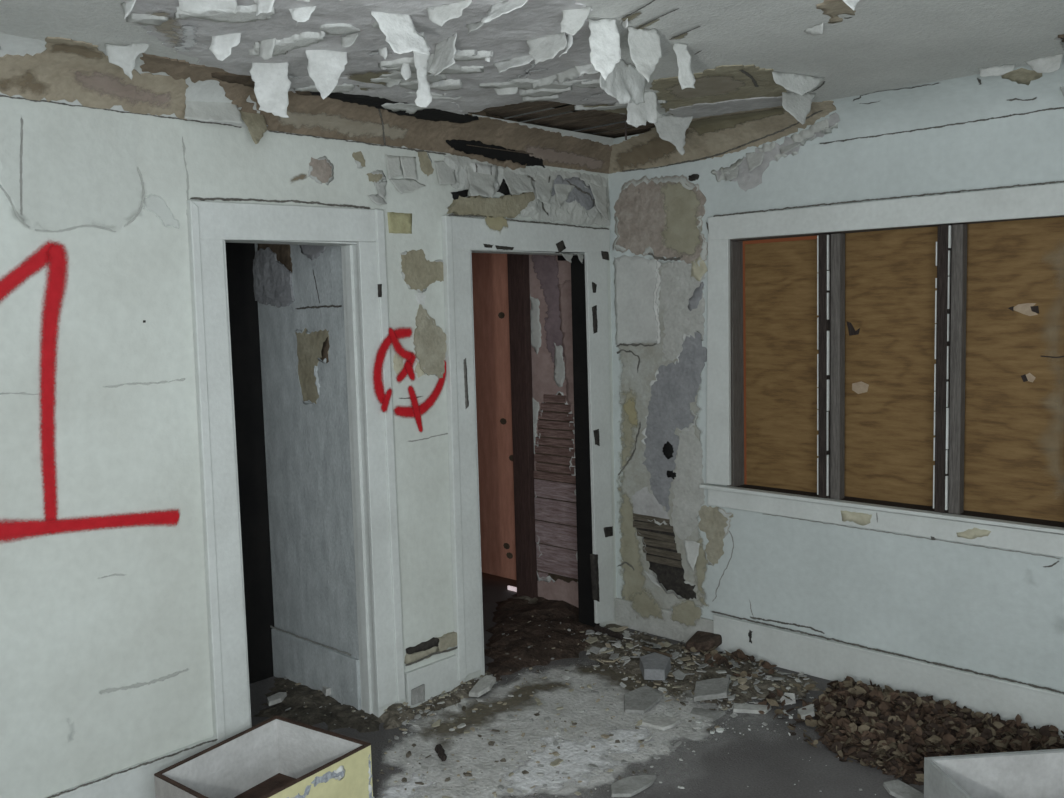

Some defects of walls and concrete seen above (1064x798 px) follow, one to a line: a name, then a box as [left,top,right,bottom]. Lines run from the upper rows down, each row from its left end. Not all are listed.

spalling [804,0,860,35]
peeling [979,34,1064,85]
peeling [0,0,840,626]